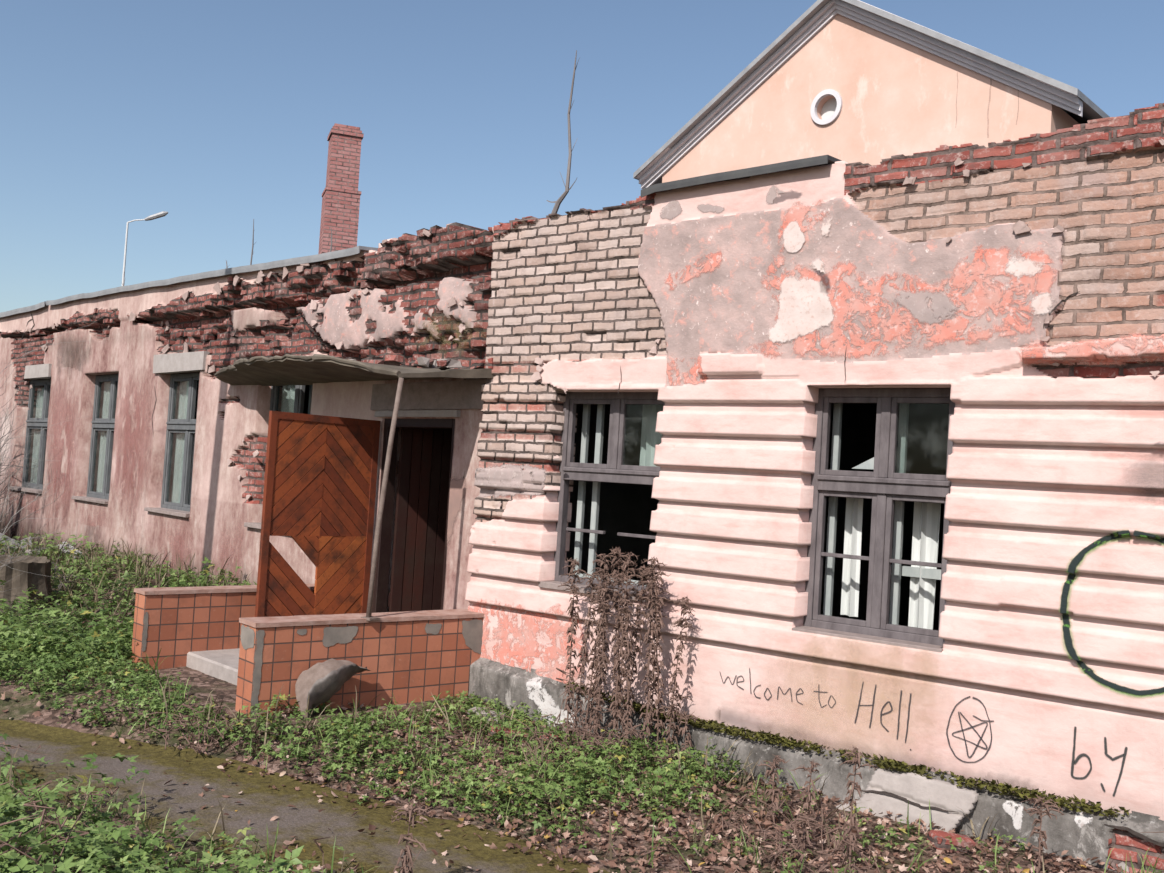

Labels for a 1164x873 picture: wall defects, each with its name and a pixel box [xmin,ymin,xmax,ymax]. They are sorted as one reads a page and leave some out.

spalling [11,323,58,410]
spalling [127,146,1164,542]
peeling [462,600,586,727]
spalling [1108,829,1164,873]